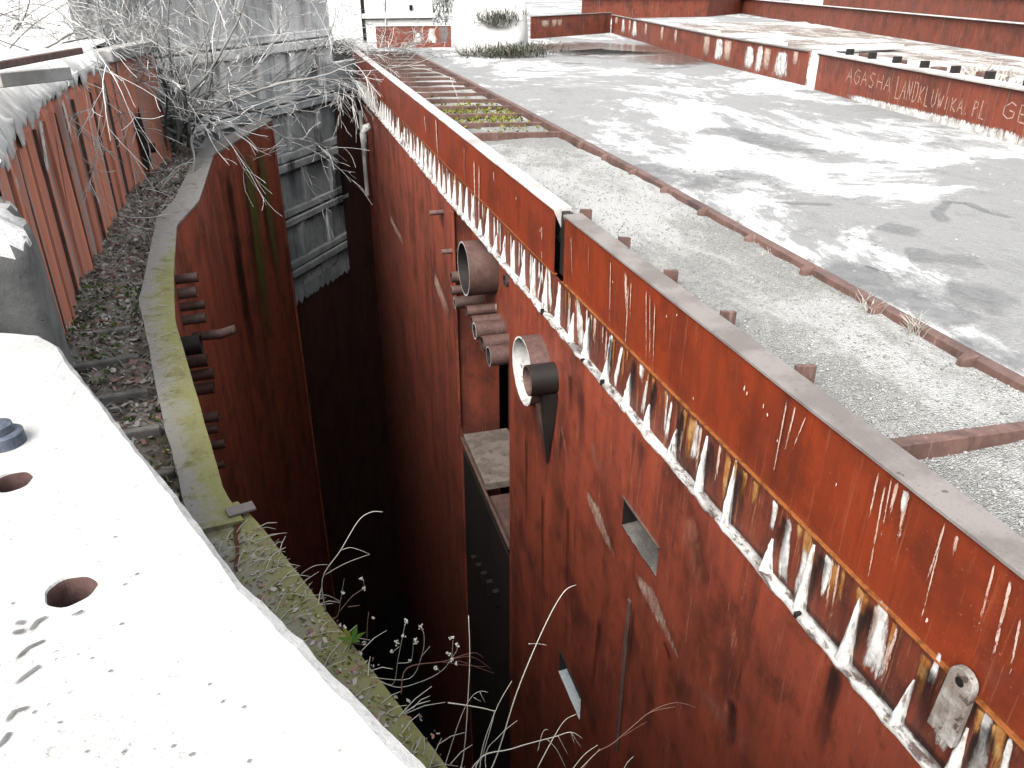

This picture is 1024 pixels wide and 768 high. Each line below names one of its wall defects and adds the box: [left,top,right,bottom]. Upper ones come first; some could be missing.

rust [565,291,628,373]
leakage [774,406,805,468]
rust [715,446,758,501]
rust [233,514,243,570]
leakage [779,519,845,602]
rust [821,555,839,595]
leakage [868,473,909,575]
leakage [922,526,958,614]
leakage [850,596,905,724]
rust [881,623,897,675]
leakage [994,582,1011,652]
rust [975,708,996,744]